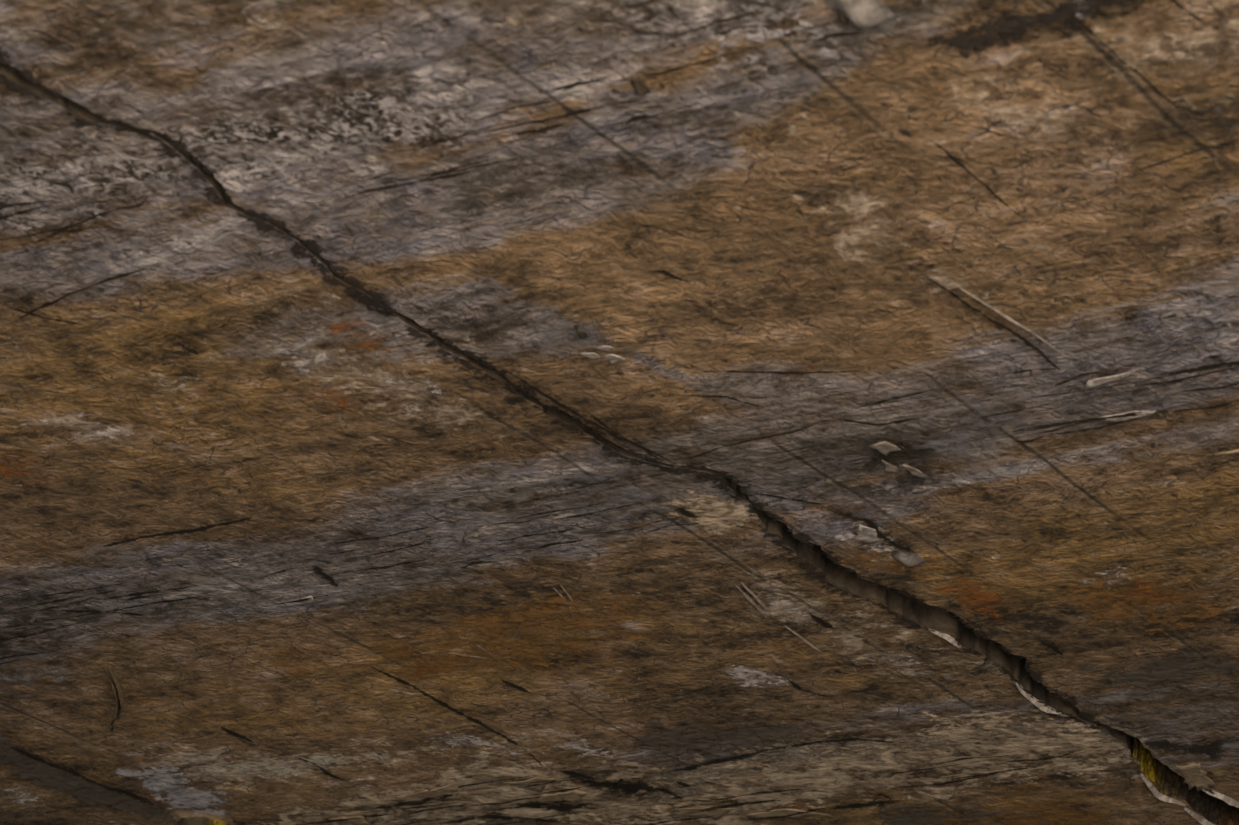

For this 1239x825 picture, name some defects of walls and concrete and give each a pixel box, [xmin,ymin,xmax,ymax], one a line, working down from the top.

crack [1171,0,1205,24]
leakage [189,0,864,155]
crack [1069,13,1178,108]
leakage [351,154,532,196]
crack [0,52,1131,749]
crack [371,666,542,766]
crack [3,743,160,807]
crack [295,756,349,782]
crack [655,738,904,800]
crack [833,794,898,810]
crack [1133,738,1239,825]